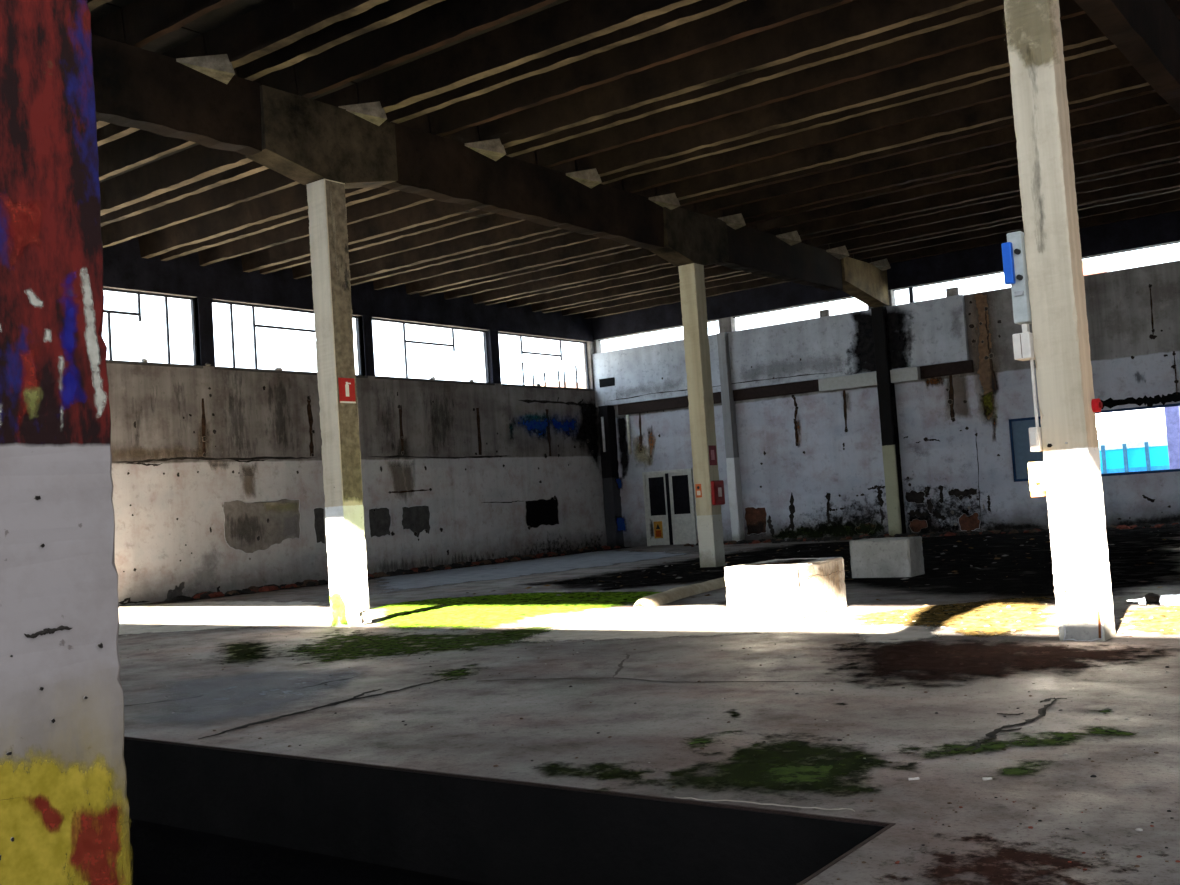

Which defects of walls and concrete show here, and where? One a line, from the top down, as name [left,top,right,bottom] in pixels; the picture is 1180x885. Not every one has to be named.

flaking render [209,499,325,560]
crack [933,697,1067,752]